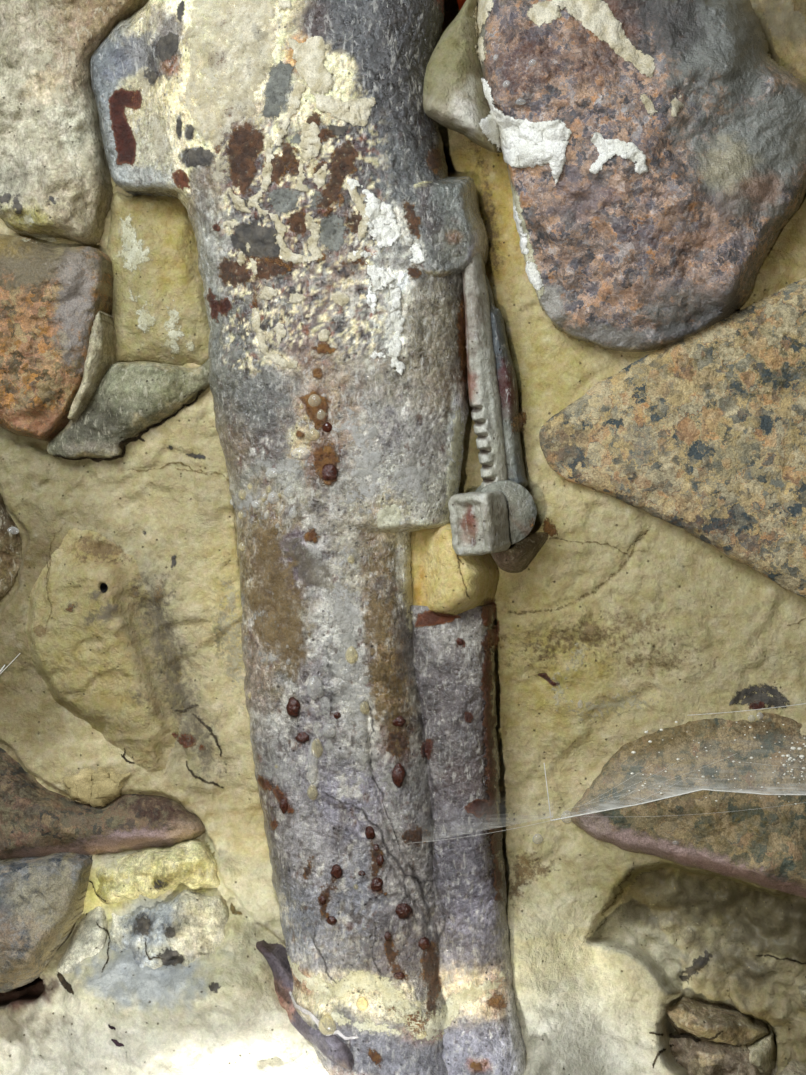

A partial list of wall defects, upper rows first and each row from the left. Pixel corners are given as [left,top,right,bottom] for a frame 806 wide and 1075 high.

peeling [135,0,376,264]
peeling [237,243,257,275]
peeling [252,286,306,369]
peeling [318,329,331,341]
rust [296,368,331,438]
rust [312,443,340,486]
crack [510,530,648,614]
rust [415,610,461,627]
rust [464,597,505,903]
rust [318,864,343,925]
rust [358,826,387,895]
rust [384,931,443,1035]